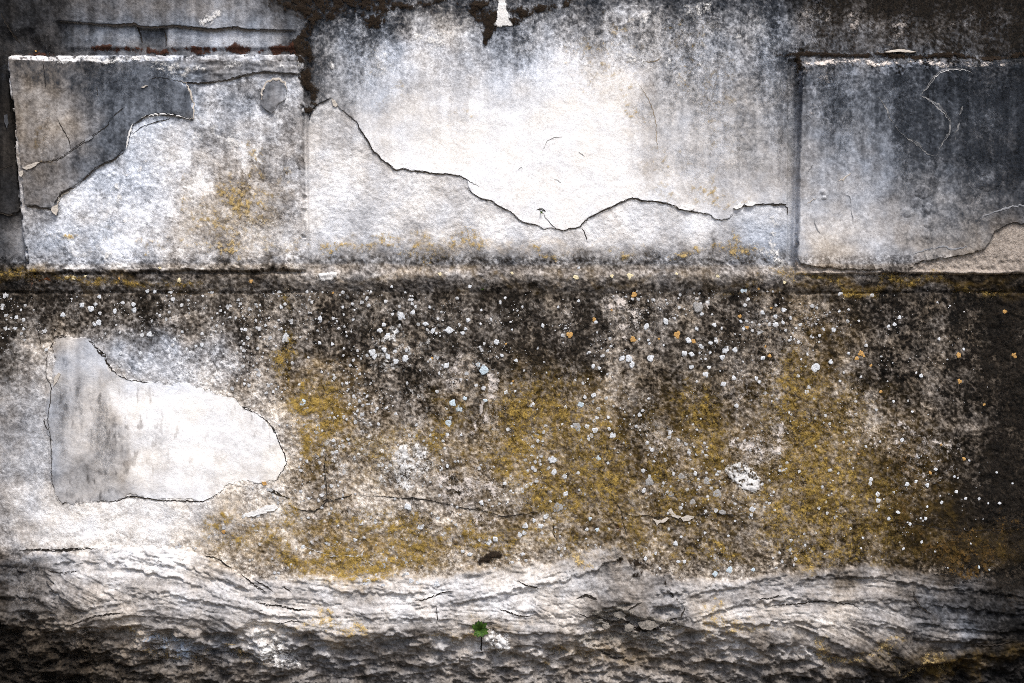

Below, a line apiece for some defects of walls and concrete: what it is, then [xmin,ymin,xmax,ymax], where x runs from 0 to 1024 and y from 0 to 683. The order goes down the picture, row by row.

peeling [0,4,1024,275]
damp [294,0,1024,236]
damp [0,217,852,440]
peeling [47,334,288,505]
damp [379,443,497,532]
damp [729,422,785,464]
damp [891,415,1024,565]
damp [0,580,161,683]
spalling [574,604,684,652]